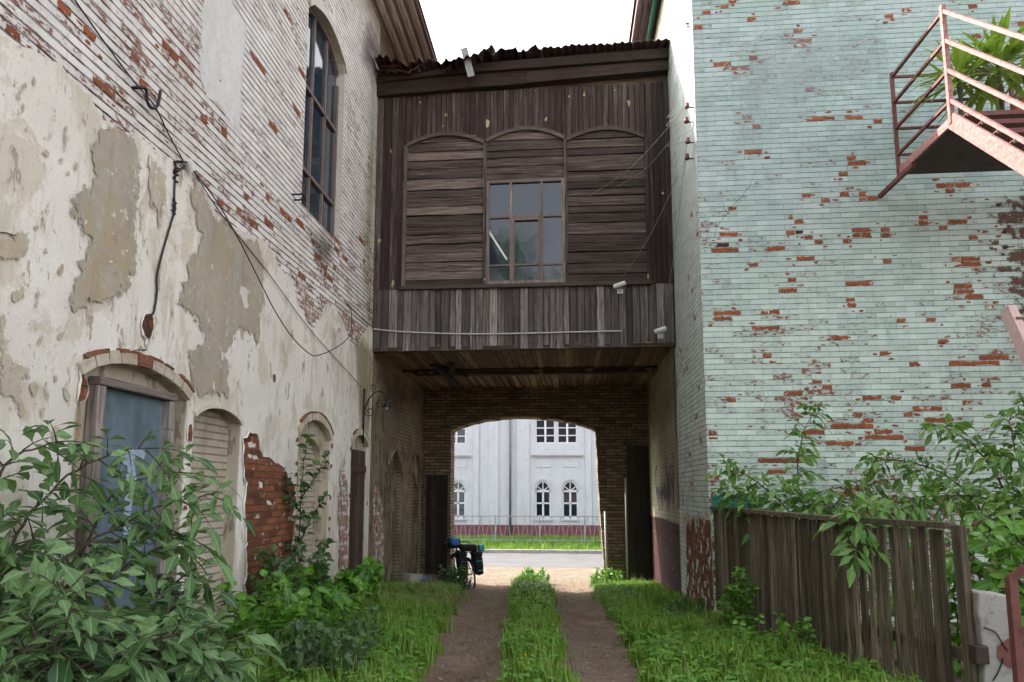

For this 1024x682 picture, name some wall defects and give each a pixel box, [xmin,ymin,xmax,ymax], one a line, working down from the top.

spalling [807,111,882,128]
peeling [58,125,166,313]
peeling [83,179,350,399]
spalling [695,207,743,253]
spalling [708,215,828,335]
spalling [801,152,878,207]
spalling [843,280,873,312]
spalling [837,223,896,248]
peeling [914,189,1024,313]
spalling [777,379,835,400]
flaking render [242,430,298,610]
flaking render [685,515,716,612]